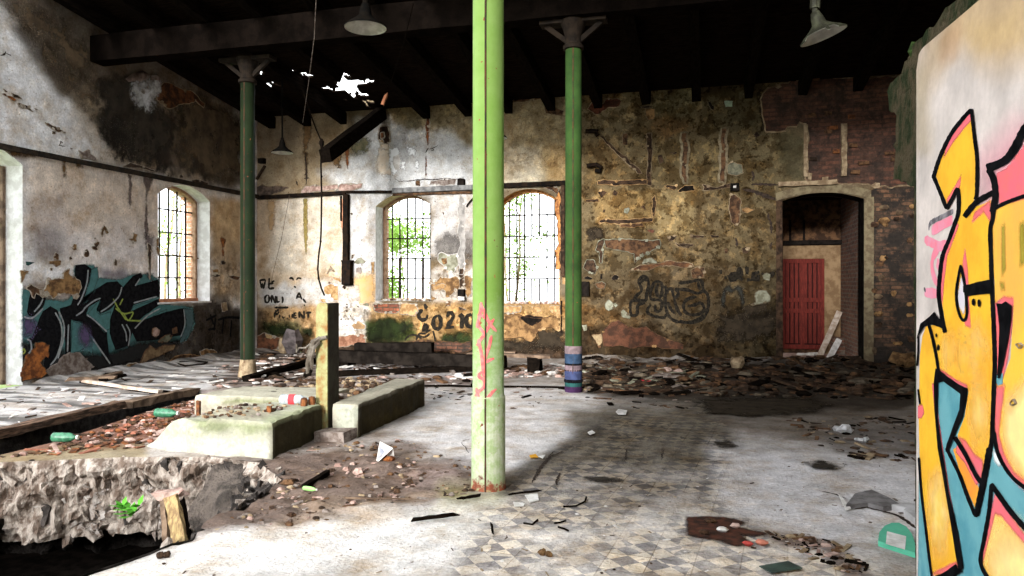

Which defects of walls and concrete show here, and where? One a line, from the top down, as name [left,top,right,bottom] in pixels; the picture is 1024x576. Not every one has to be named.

spalling [20,341,95,382]
spalling [20,225,109,300]
water stain [7,1,240,236]
spalling [156,82,205,109]
spalling [582,105,754,349]
spalling [751,75,915,364]